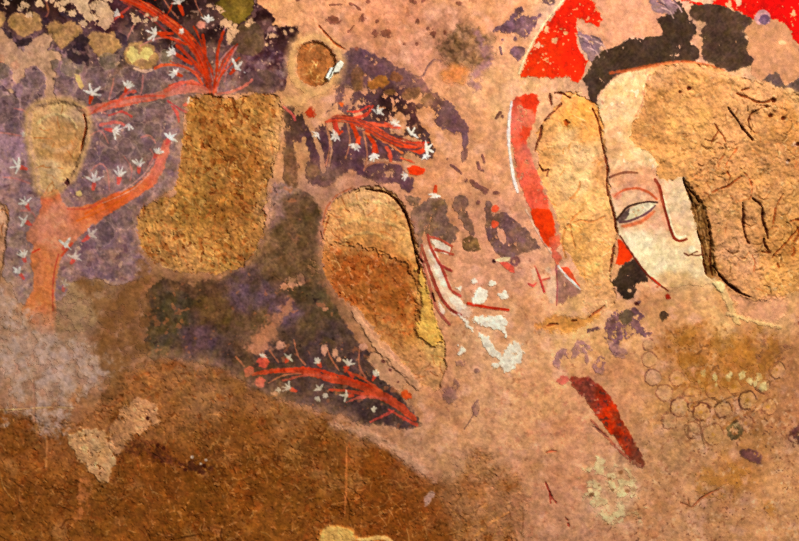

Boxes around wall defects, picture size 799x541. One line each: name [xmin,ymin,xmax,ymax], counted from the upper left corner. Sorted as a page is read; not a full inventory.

flaking render [0,28,93,198]
peeling [1,0,115,30]
peeling [127,46,154,73]
peeling [130,13,159,25]
peeling [207,4,256,45]
flaking render [136,29,345,276]
flaking render [322,186,448,391]
flaking render [534,92,619,334]
flaking render [629,19,799,329]
flaking render [0,359,533,541]